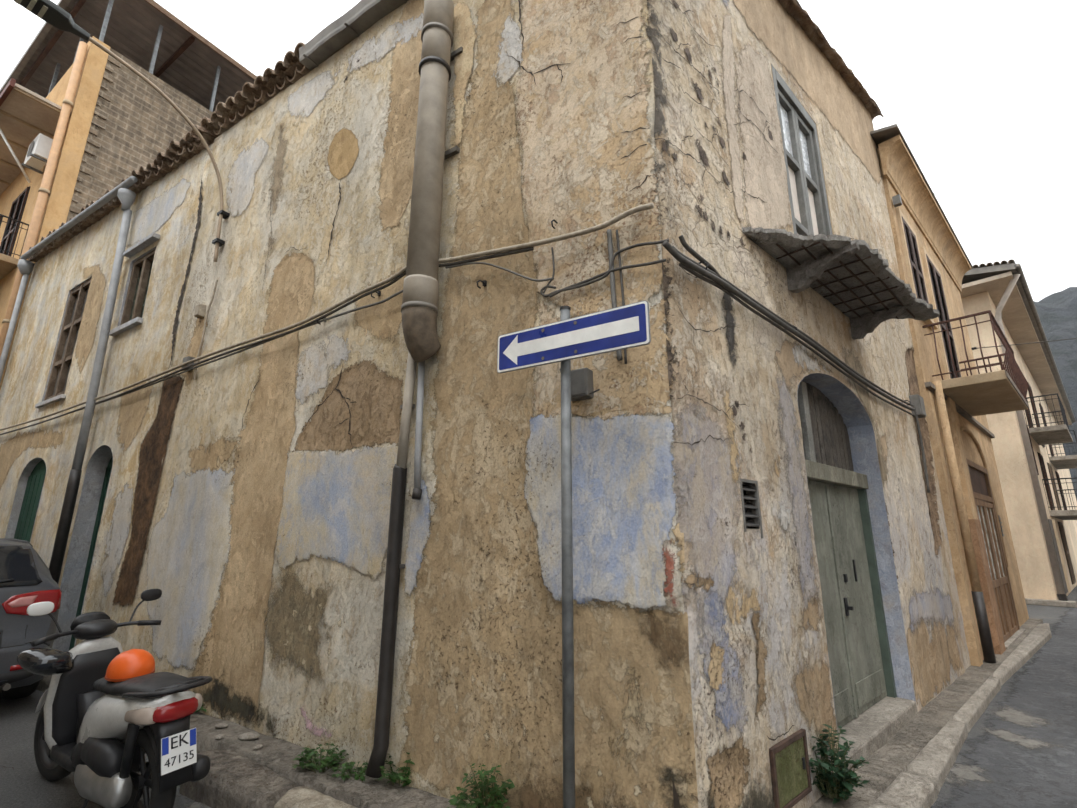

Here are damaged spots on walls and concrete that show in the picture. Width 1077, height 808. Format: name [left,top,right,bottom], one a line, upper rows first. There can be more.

peeling [126,178,190,246]
crack [167,180,202,374]
spalling [288,0,424,232]
crack [507,0,570,86]
crack [617,1,778,203]
spalling [695,0,882,246]
spalling [776,241,915,319]
peeling [101,483,134,596]
spalling [117,378,154,455]
spalling [147,252,406,722]
spalling [398,0,768,808]
crack [674,376,749,446]